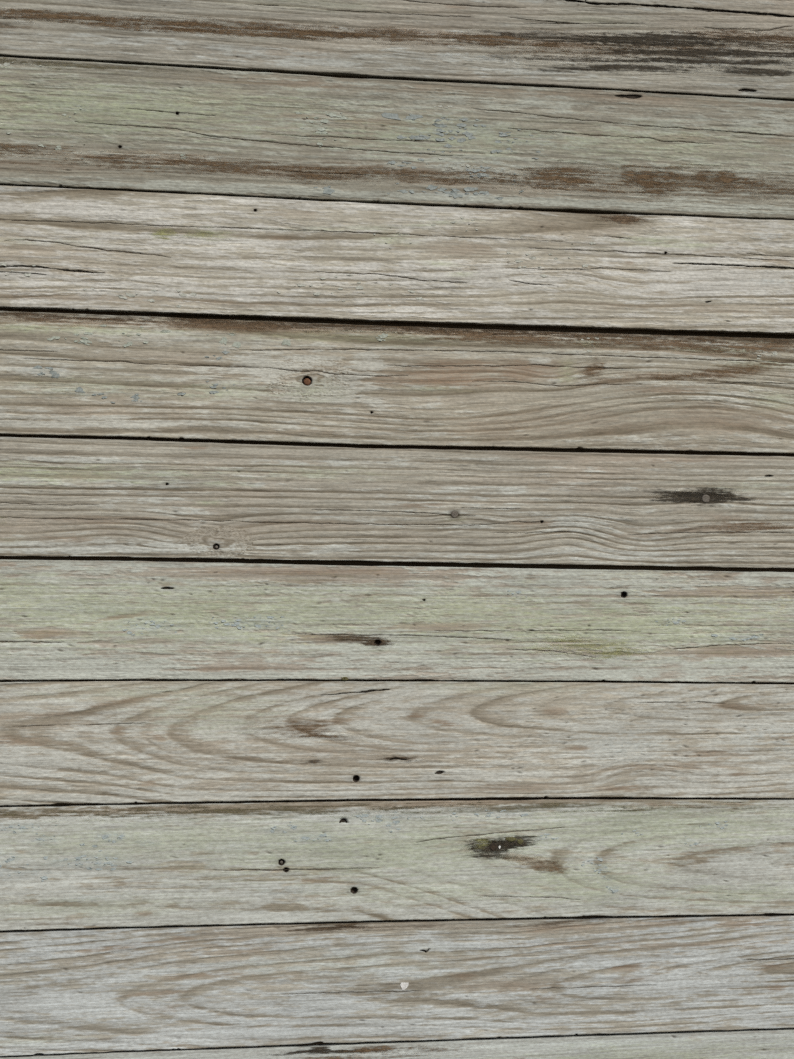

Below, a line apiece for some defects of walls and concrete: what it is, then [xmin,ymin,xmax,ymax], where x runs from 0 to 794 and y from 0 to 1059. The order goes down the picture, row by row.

crack [330,0,794,31]
peeling [387,105,504,200]